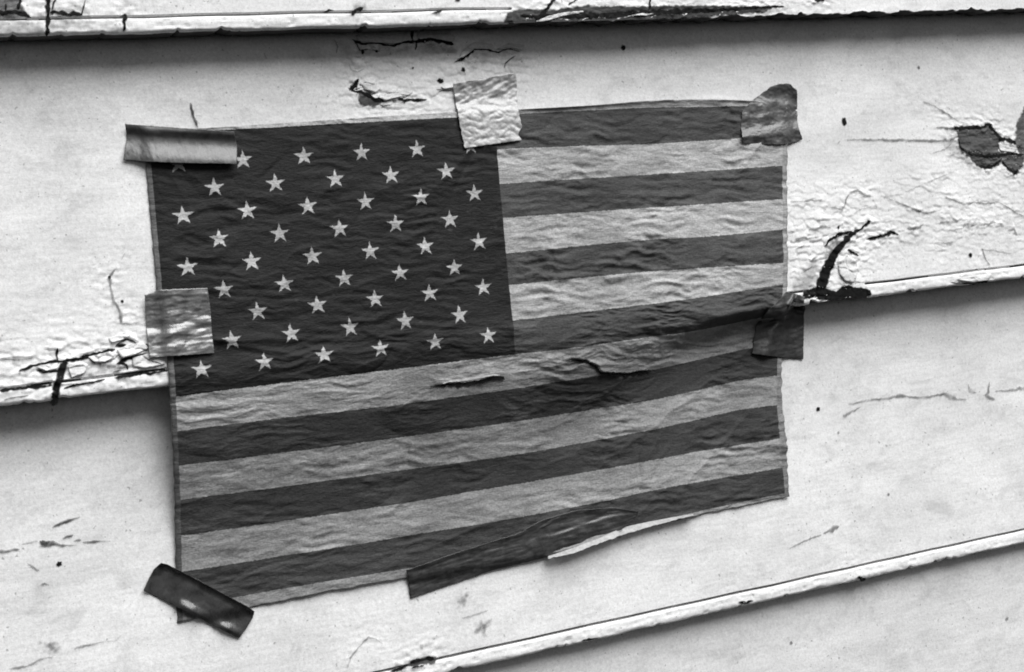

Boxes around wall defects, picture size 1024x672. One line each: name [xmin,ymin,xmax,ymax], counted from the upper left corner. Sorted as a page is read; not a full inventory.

spalling [504,0,784,23]
crack [352,31,524,72]
spalling [954,110,1024,175]
crack [797,190,1023,301]
crack [0,348,168,406]